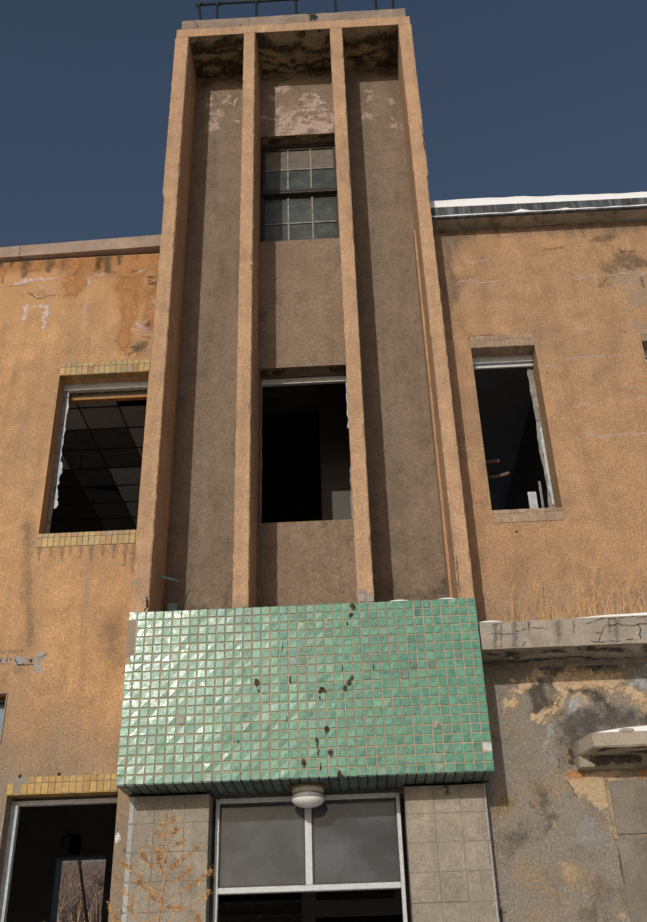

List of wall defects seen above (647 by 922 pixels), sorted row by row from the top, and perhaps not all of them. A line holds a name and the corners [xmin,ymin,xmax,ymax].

water stain [190,35,244,83]
water stain [256,30,335,145]
water stain [343,29,398,76]
water stain [0,259,65,330]
crack [585,616,647,643]
water stain [482,620,630,714]
peeling [502,664,647,725]
water stain [543,689,647,765]
water stain [628,644,647,689]
peeling [565,746,647,831]